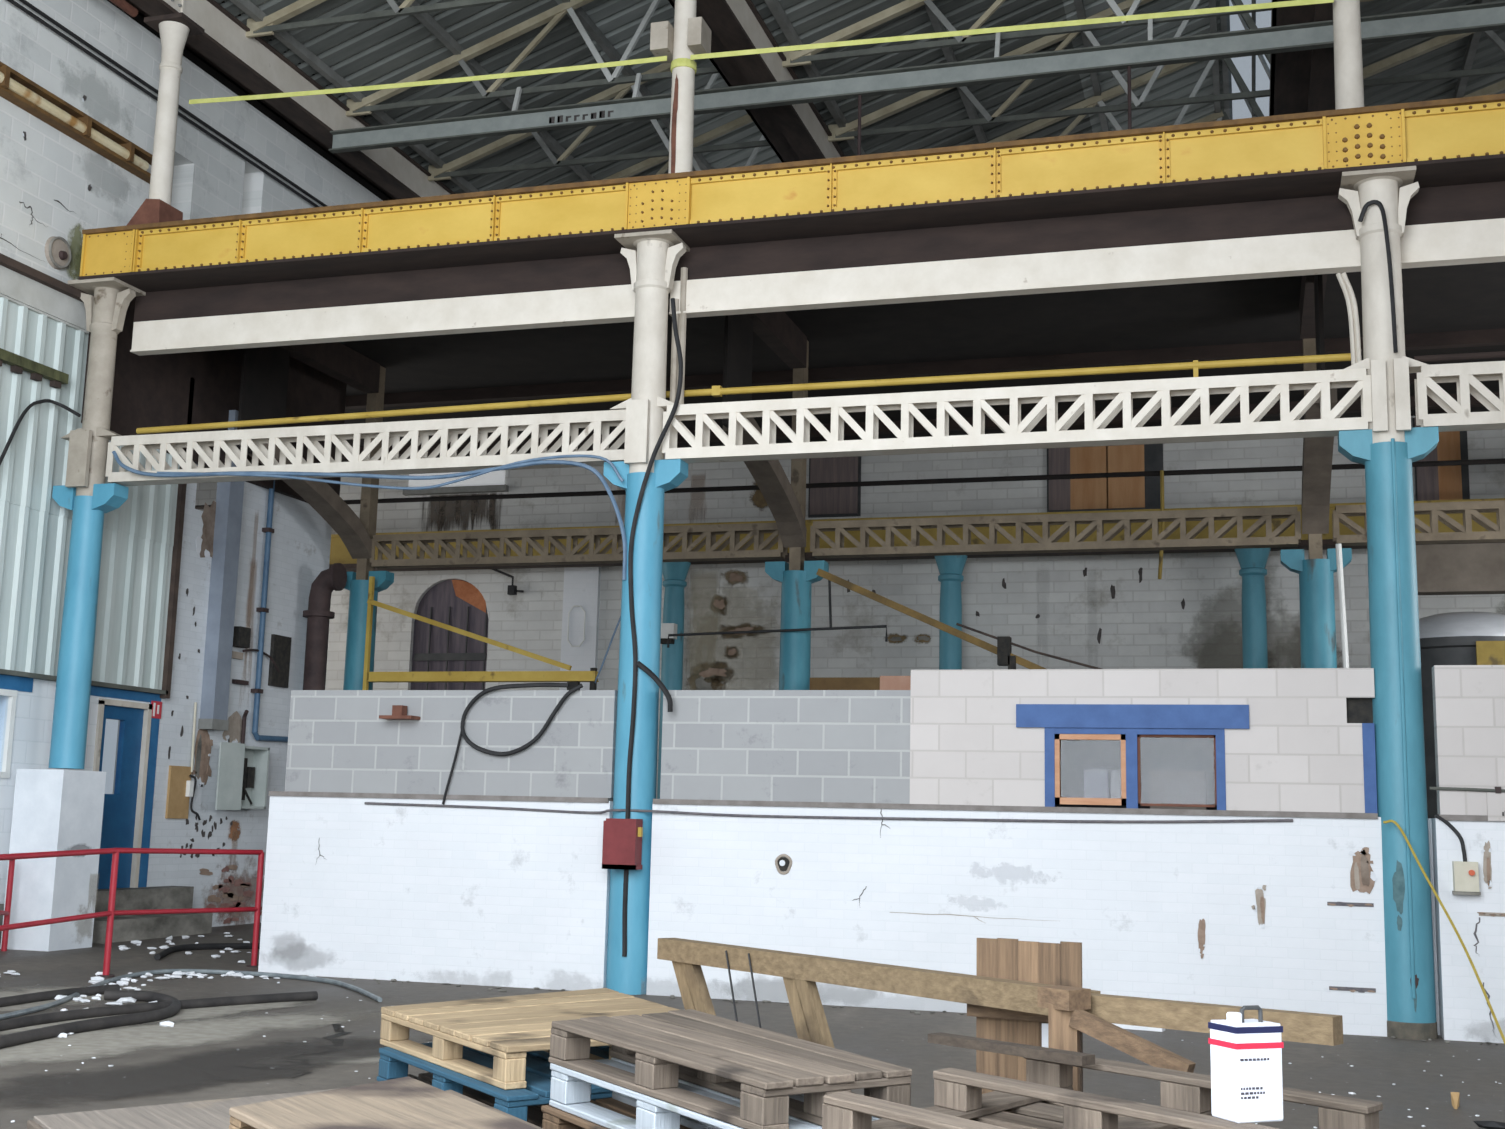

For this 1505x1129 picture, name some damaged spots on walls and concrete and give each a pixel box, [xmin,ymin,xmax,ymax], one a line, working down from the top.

crack [0,200,73,258]
peeling [196,501,216,558]
flaking render [686,570,764,690]
spalling [180,815,264,925]
peeling [1251,885,1266,929]
peeling [1328,847,1405,931]
peeling [1481,841,1492,889]
peeling [1198,919,1206,959]